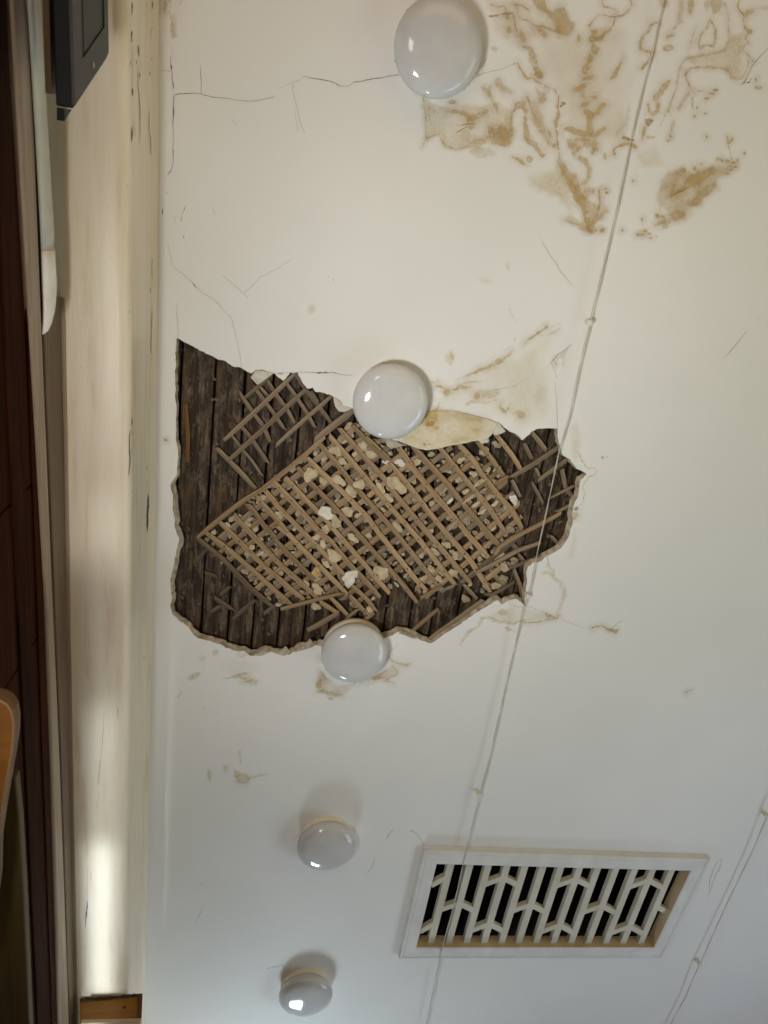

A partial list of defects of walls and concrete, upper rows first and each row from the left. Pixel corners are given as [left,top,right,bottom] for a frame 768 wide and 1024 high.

crack [130,2,396,176]
water stain [489,0,620,177]
water stain [558,163,608,233]
crack [152,208,287,367]
spalling [170,338,586,656]
water stain [400,410,481,448]